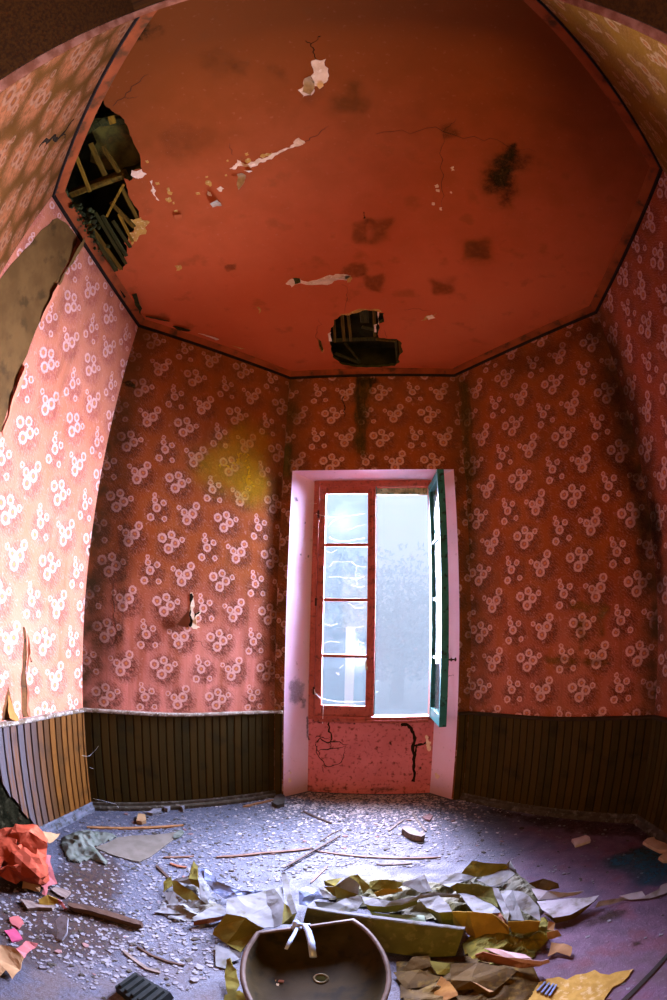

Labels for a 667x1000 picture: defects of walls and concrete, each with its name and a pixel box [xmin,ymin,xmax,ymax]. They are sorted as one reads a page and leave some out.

peeling [298,59,329,97]
peeling [150,181,183,221]
peeling [196,138,305,207]
leakage [485,144,521,203]
peeling [286,274,352,287]
flaking render [0,188,99,436]
leakage [354,377,377,457]
crack [315,722,347,772]
crack [401,723,426,782]